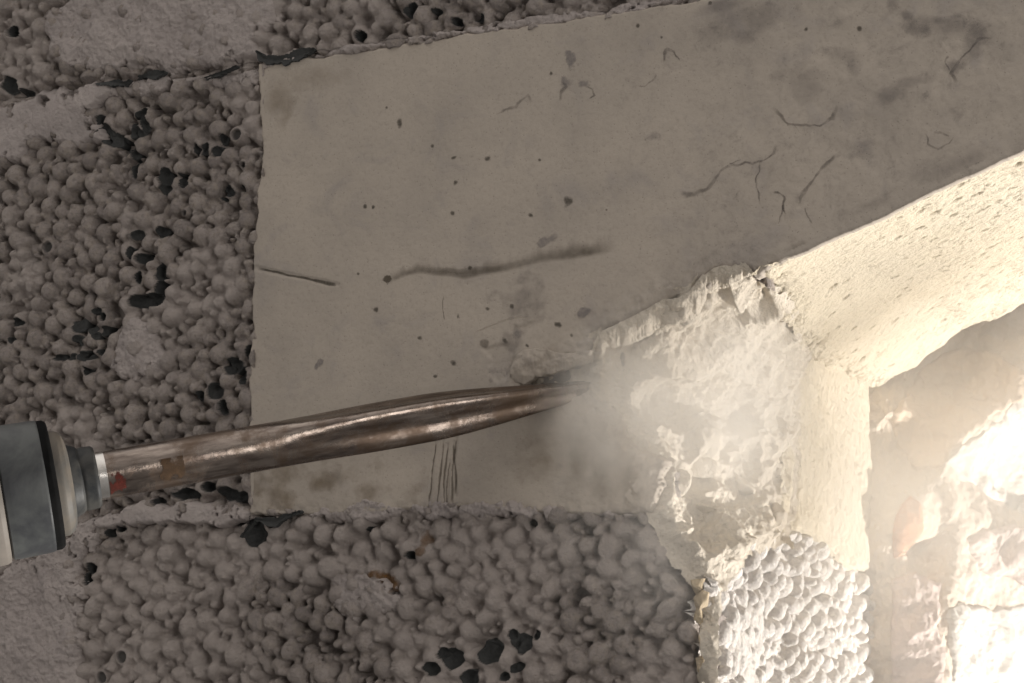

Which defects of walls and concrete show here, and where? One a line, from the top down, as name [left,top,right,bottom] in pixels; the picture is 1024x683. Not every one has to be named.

crack [264,269,334,286]
spalling [510,262,813,683]